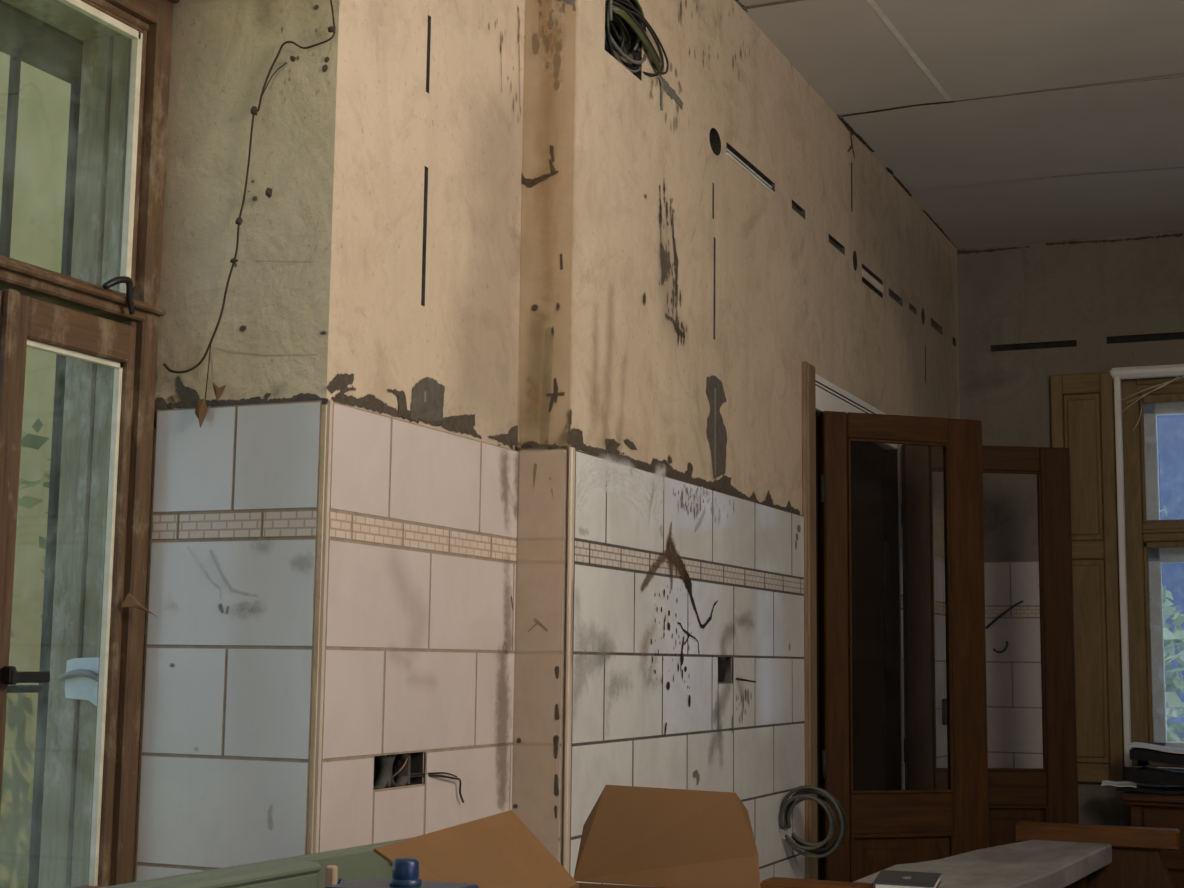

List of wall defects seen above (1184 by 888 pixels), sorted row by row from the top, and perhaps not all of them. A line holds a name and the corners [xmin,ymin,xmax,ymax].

damp [644,182,687,344]
peeling [154,373,800,515]